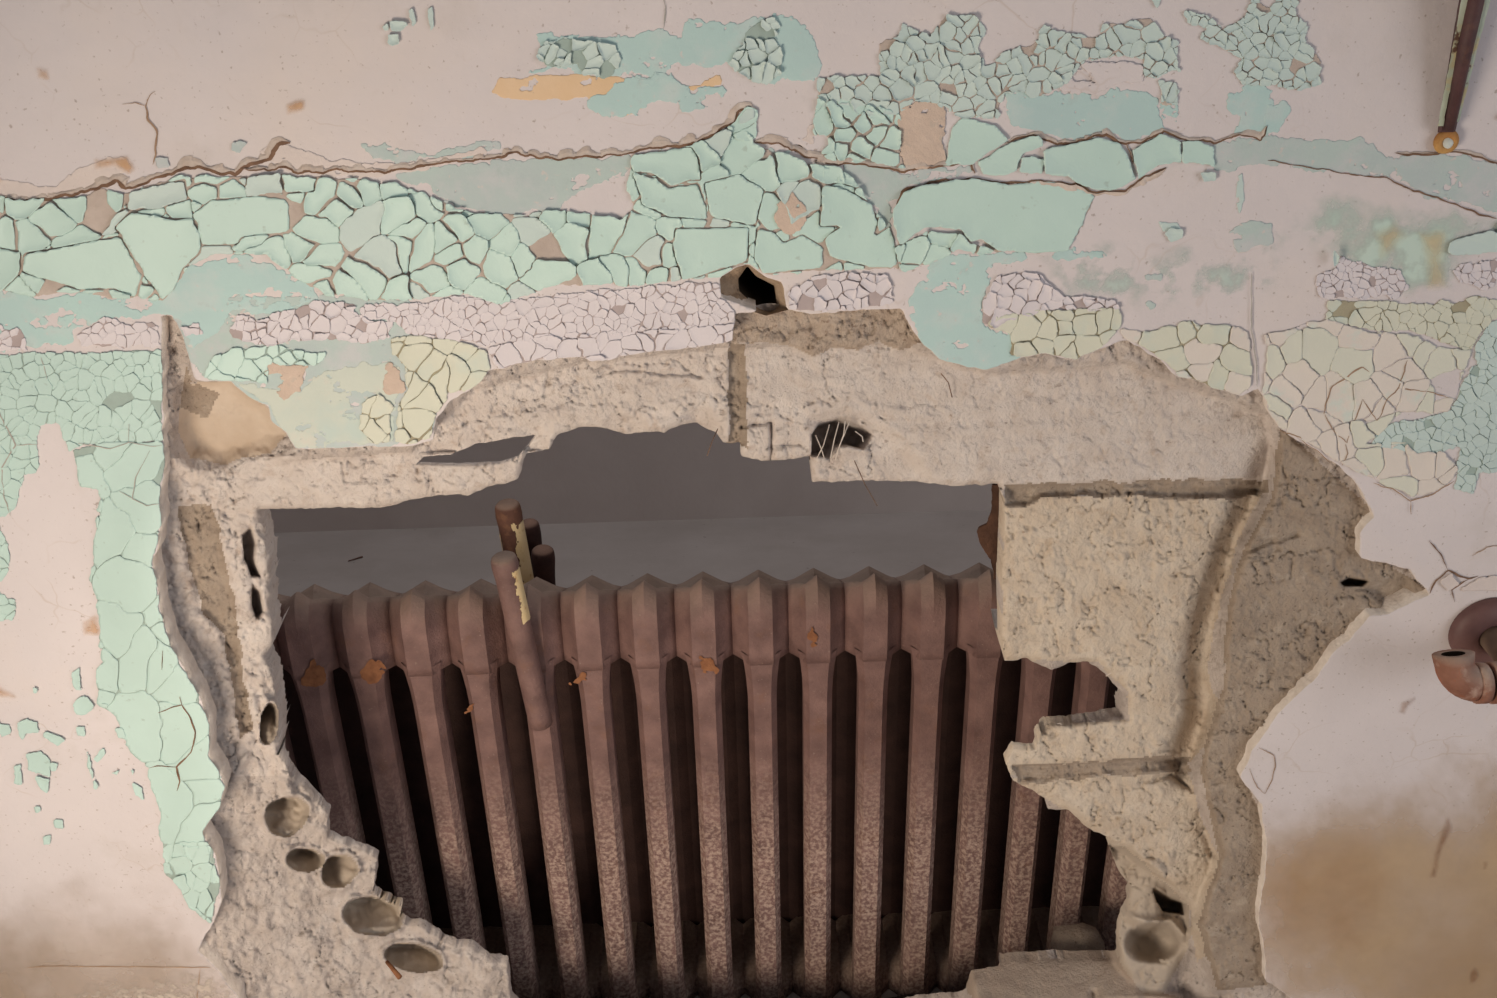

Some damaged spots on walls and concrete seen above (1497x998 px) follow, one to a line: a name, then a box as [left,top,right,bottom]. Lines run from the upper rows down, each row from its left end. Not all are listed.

peeling [382,7,434,46]
peeling [0,13,1183,347]
crack [0,92,1497,219]
peeling [1132,0,1497,213]
peeling [1229,220,1274,253]
peeling [1316,207,1497,300]
crack [1279,360,1448,465]
crack [1375,481,1454,512]
spalling [0,251,1497,998]
crack [1430,542,1492,602]
damp [1262,805,1497,998]